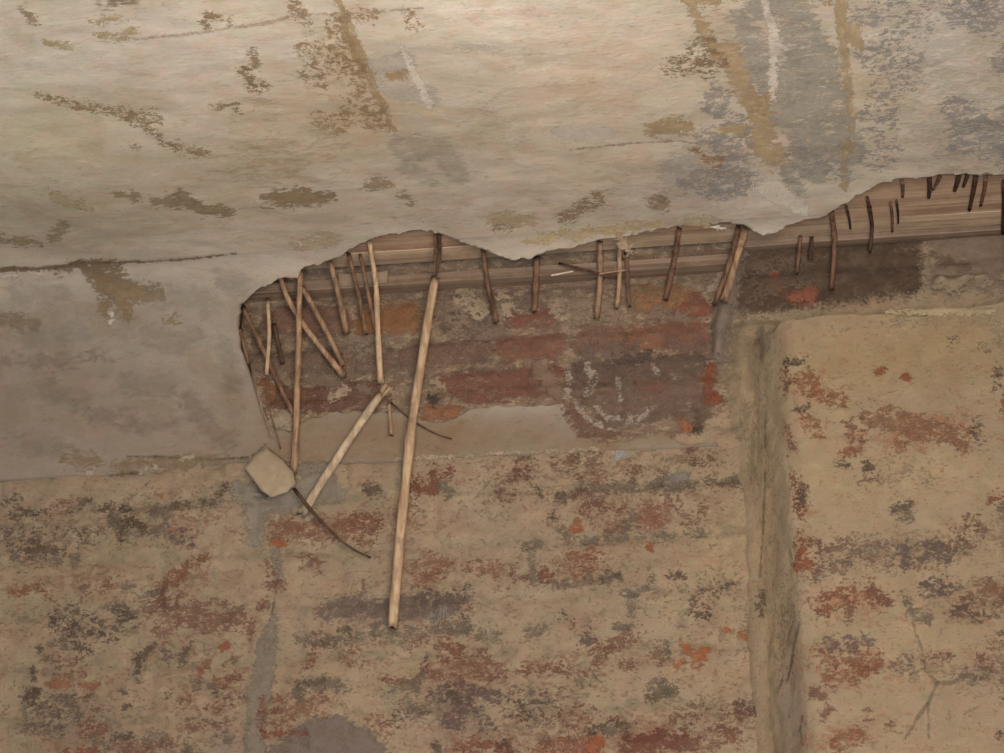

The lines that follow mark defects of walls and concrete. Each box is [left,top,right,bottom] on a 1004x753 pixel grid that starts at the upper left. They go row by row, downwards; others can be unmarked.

water stain [285,0,397,136]
water stain [819,0,864,191]
spalling [242,272,746,553]
peeling [402,545,608,588]